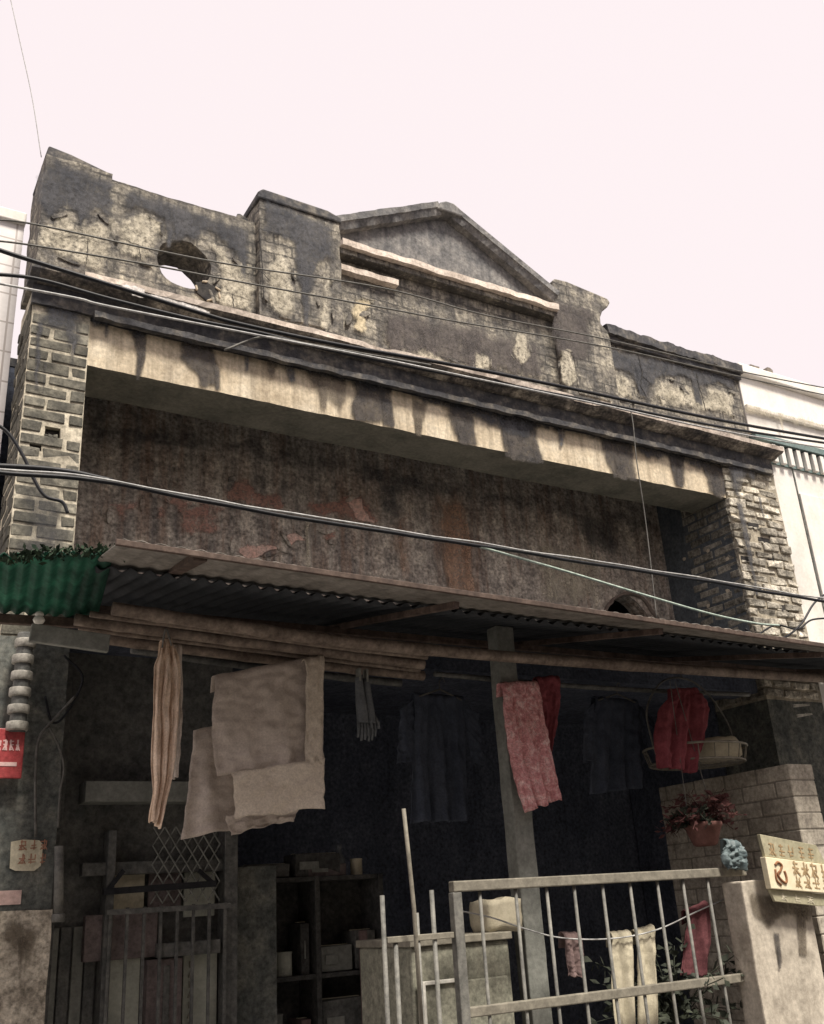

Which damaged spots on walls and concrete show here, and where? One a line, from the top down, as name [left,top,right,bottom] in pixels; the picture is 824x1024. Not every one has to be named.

water stain [38,159,248,286]
water stain [265,201,332,326]
water stain [127,328,146,379]
water stain [181,341,220,390]
water stain [268,360,395,427]
water stain [385,314,541,377]
spalling [509,335,532,363]
spalling [558,349,577,386]
spalling [616,377,635,405]
water stain [612,350,734,405]
spalling [656,378,736,416]
water stain [413,394,769,595]